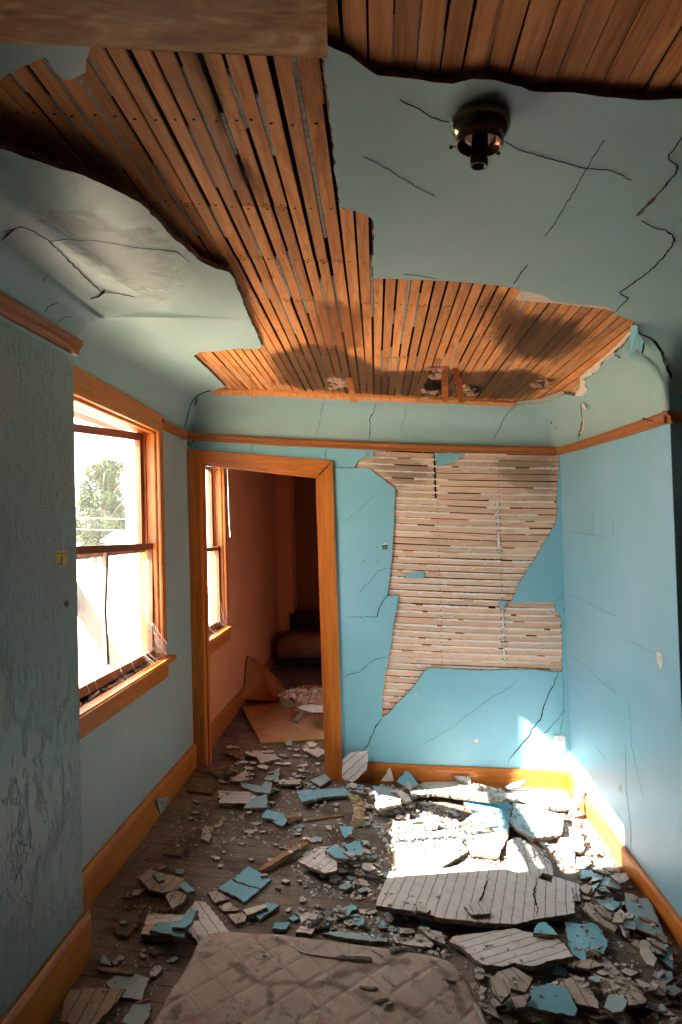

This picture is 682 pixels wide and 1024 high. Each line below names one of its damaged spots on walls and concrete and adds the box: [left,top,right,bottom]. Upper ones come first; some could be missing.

flaking render [327,0,682,94]
crack [400,100,449,122]
crack [1,227,189,322]
flaking render [0,47,644,410]
crack [364,157,435,197]
crack [504,140,631,236]
crack [616,137,682,312]
flaking render [355,451,562,716]